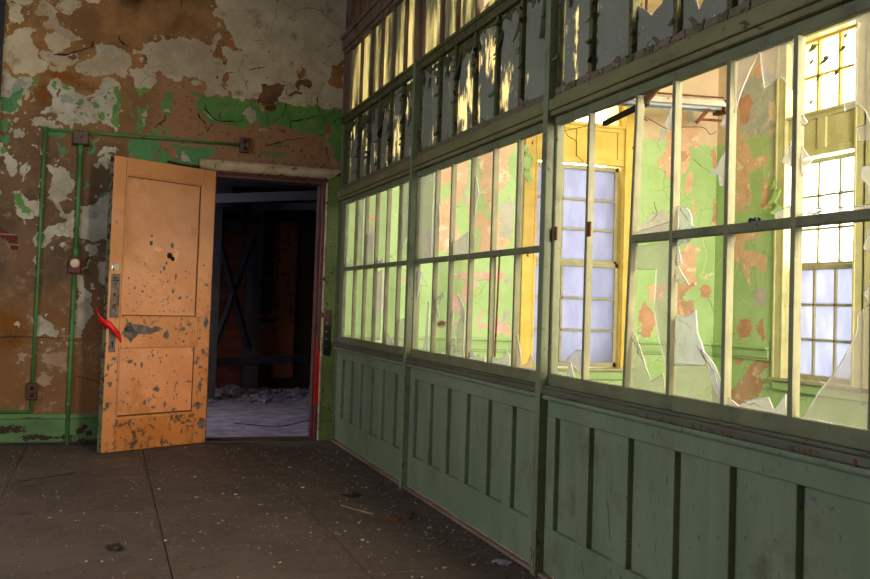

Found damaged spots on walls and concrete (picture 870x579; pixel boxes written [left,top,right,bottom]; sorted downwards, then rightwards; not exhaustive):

crack [54,41,94,56]
crack [198,2,343,146]
peeling [0,0,559,391]